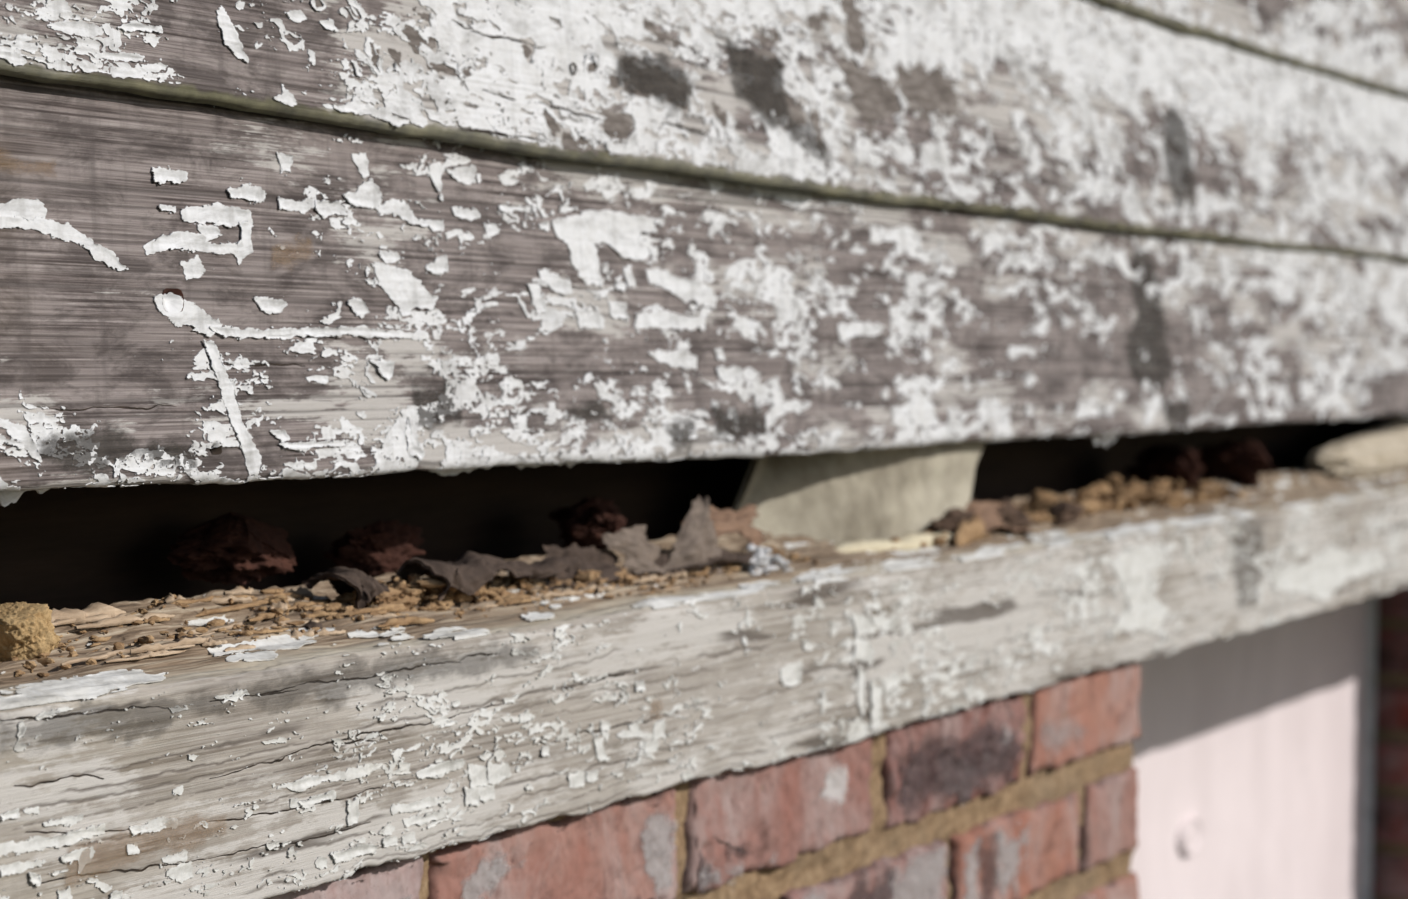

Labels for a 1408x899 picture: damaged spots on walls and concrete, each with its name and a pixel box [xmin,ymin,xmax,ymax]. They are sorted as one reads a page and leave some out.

peeling [216,5,249,63]
peeling [284,0,339,32]
peeling [350,7,477,78]
peeling [807,0,959,131]
peeling [542,107,633,156]
peeling [0,198,129,271]
peeling [498,203,717,332]
peeling [142,152,491,476]
peeling [648,348,697,371]
peeling [837,321,885,343]
peeling [272,763,383,826]
peeling [0,806,106,899]